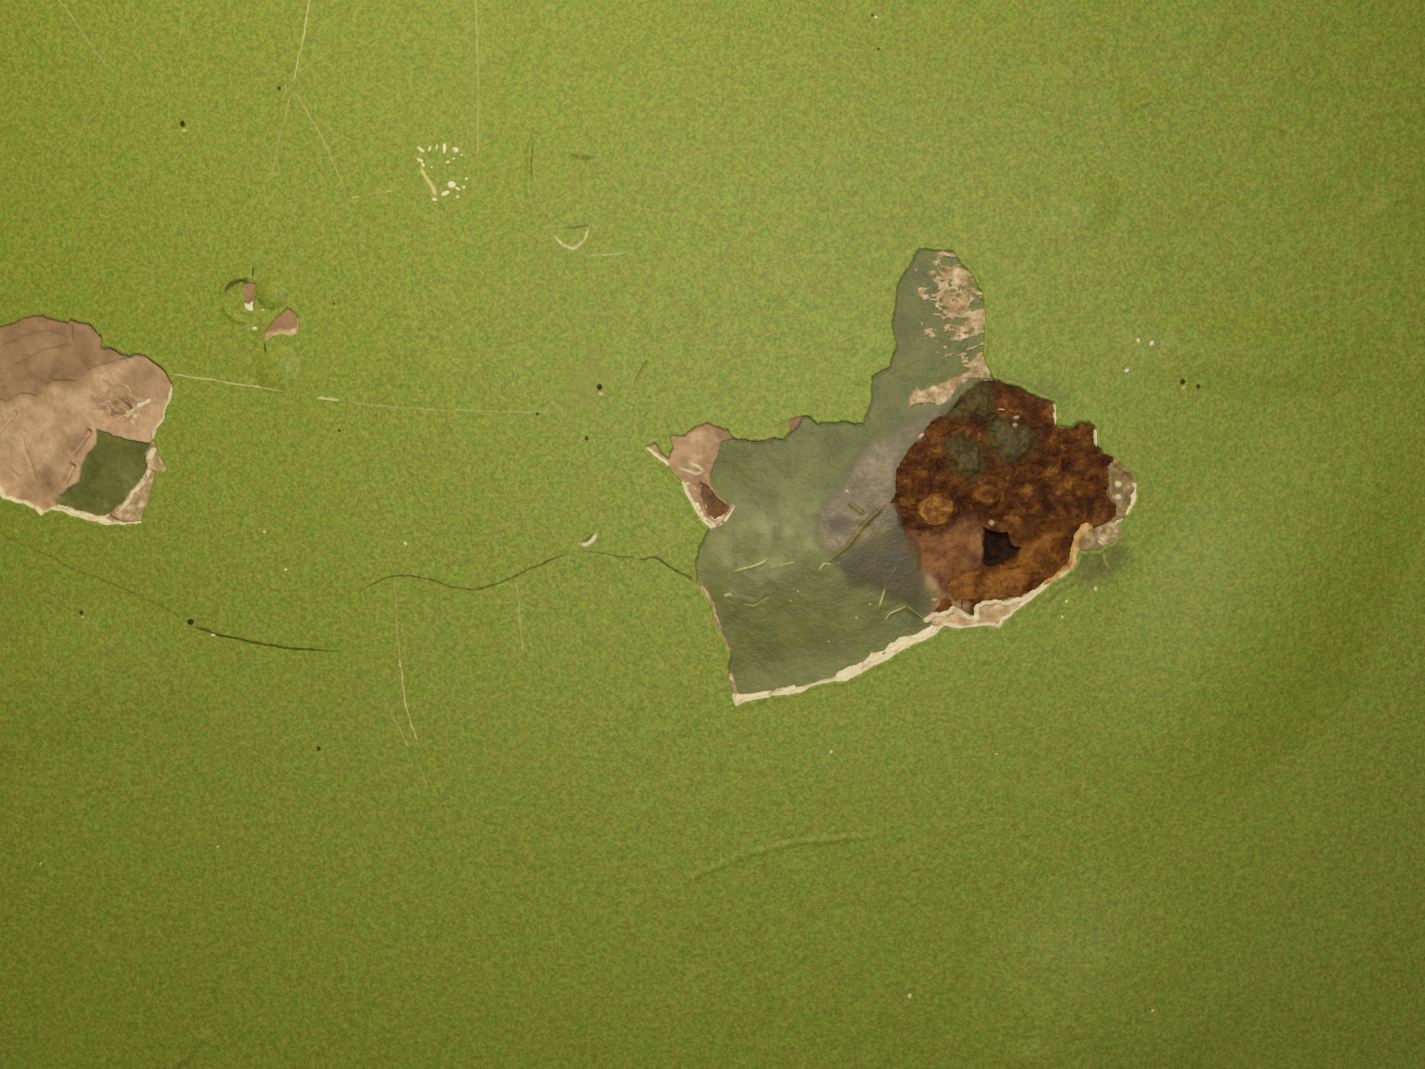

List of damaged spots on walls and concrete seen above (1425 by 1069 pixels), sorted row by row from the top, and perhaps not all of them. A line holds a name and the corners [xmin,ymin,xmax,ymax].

peeling [217,269,299,352]
peeling [0,316,173,525]
peeling [646,249,1137,706]
crack [187,619,314,650]